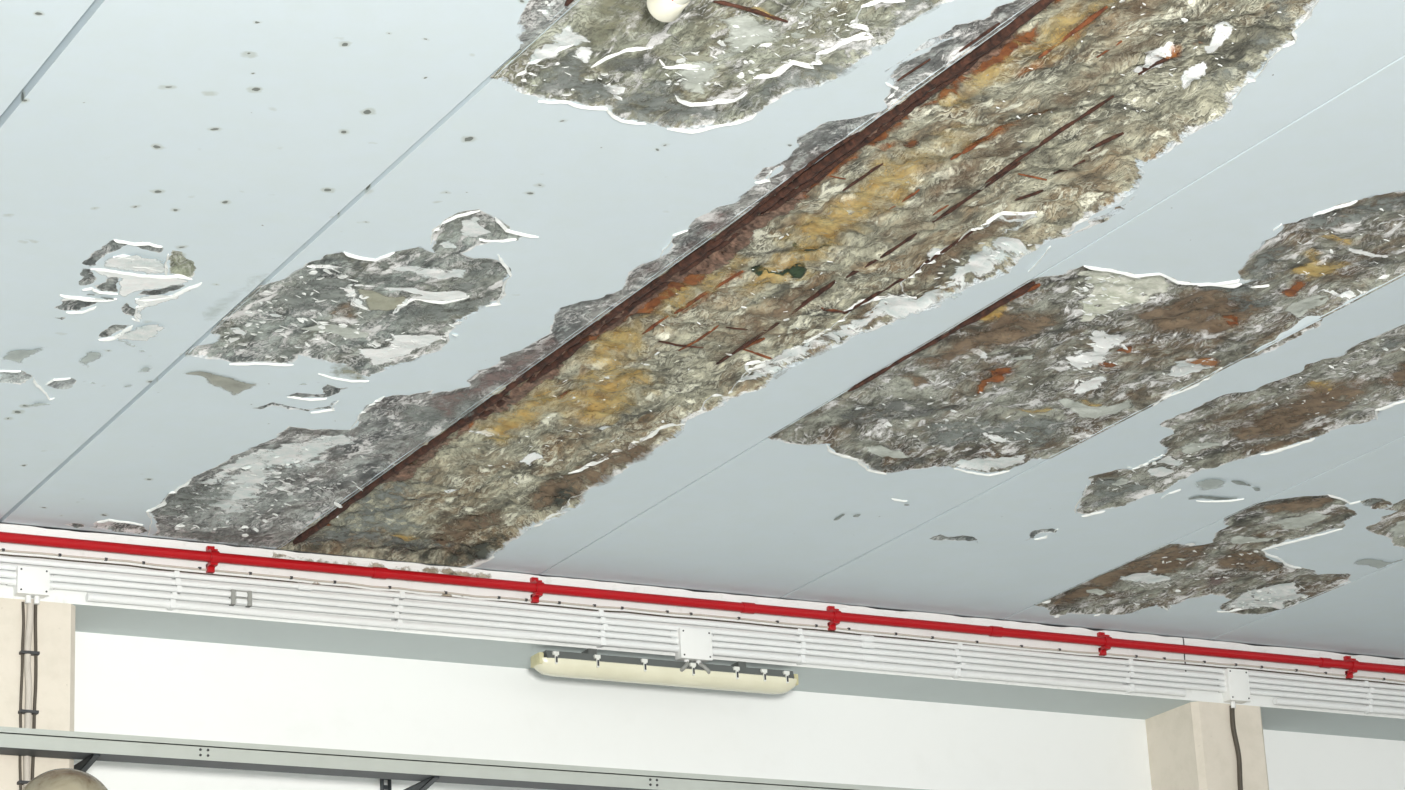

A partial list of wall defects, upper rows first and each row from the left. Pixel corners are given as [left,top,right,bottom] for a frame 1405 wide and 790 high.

spalling [54,0,1405,568]
peeling [0,349,76,406]
peeling [1034,494,1405,618]